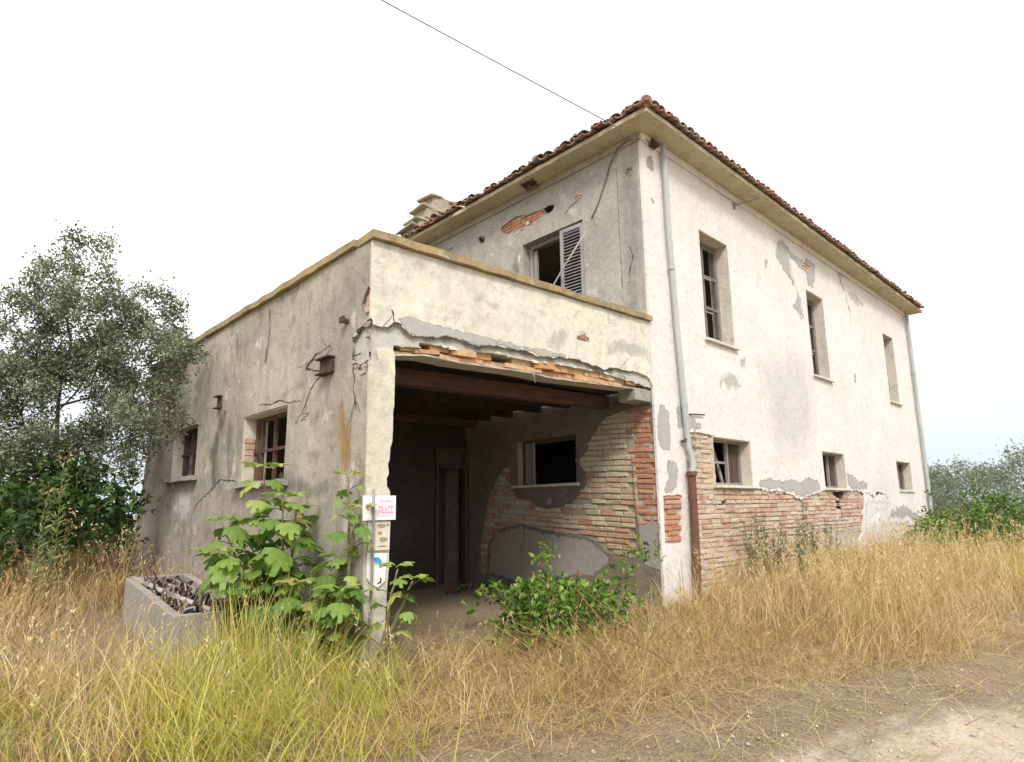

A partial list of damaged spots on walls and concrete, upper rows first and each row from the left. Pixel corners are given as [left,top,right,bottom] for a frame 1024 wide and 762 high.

flaking render [500,195,582,235]
flaking render [351,286,371,339]
flaking render [765,239,815,318]
spalling [393,316,647,391]
crack [187,474,237,528]
flaking render [481,405,923,597]